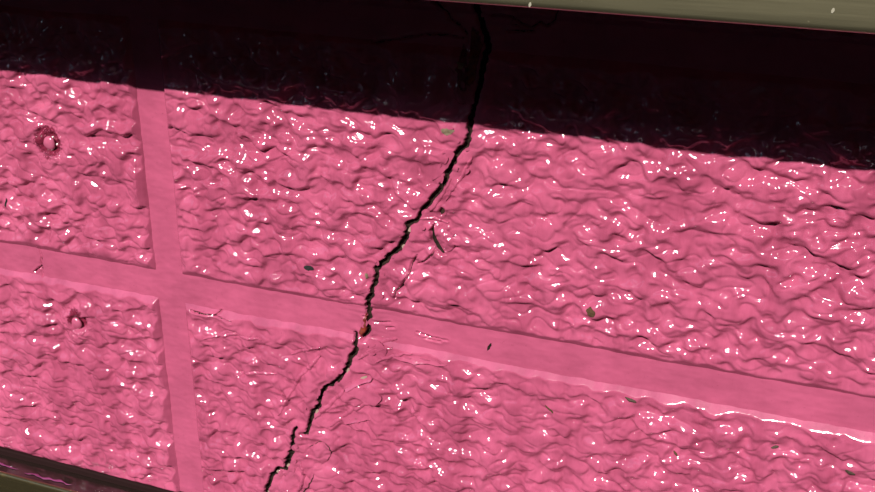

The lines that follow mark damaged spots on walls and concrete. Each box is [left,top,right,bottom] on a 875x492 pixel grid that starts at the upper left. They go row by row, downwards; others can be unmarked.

crack [265,1,557,492]